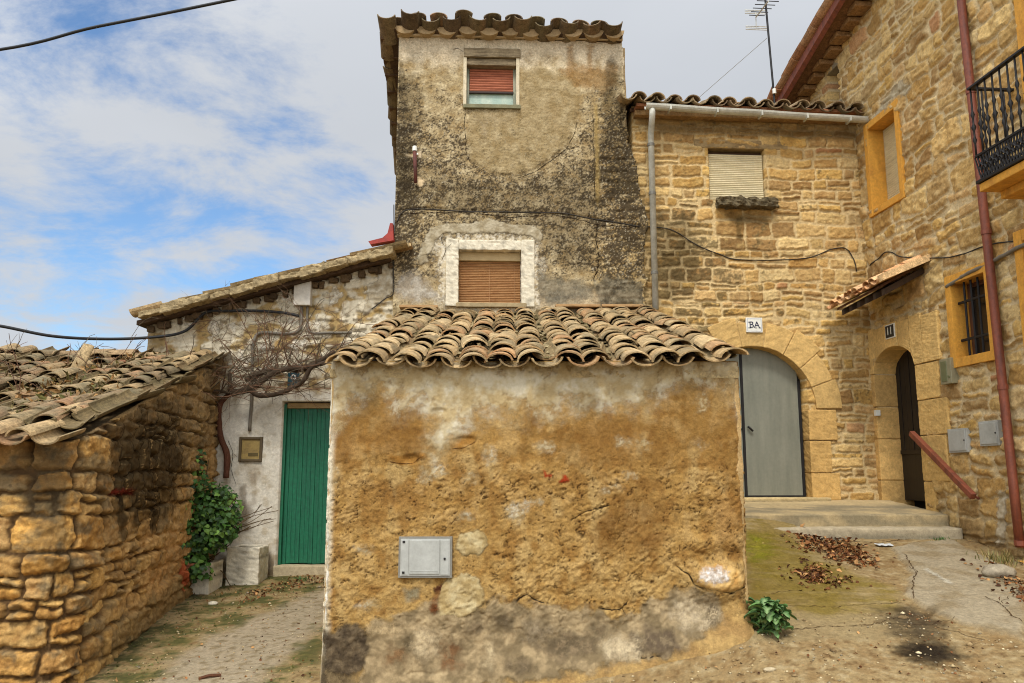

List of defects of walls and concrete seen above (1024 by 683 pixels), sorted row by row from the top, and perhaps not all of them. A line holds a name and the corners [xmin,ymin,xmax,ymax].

leakage [397,273,444,301]
leakage [541,276,646,304]
peeling [331,362,738,474]
leakage [321,623,369,683]
spalling [359,587,721,683]